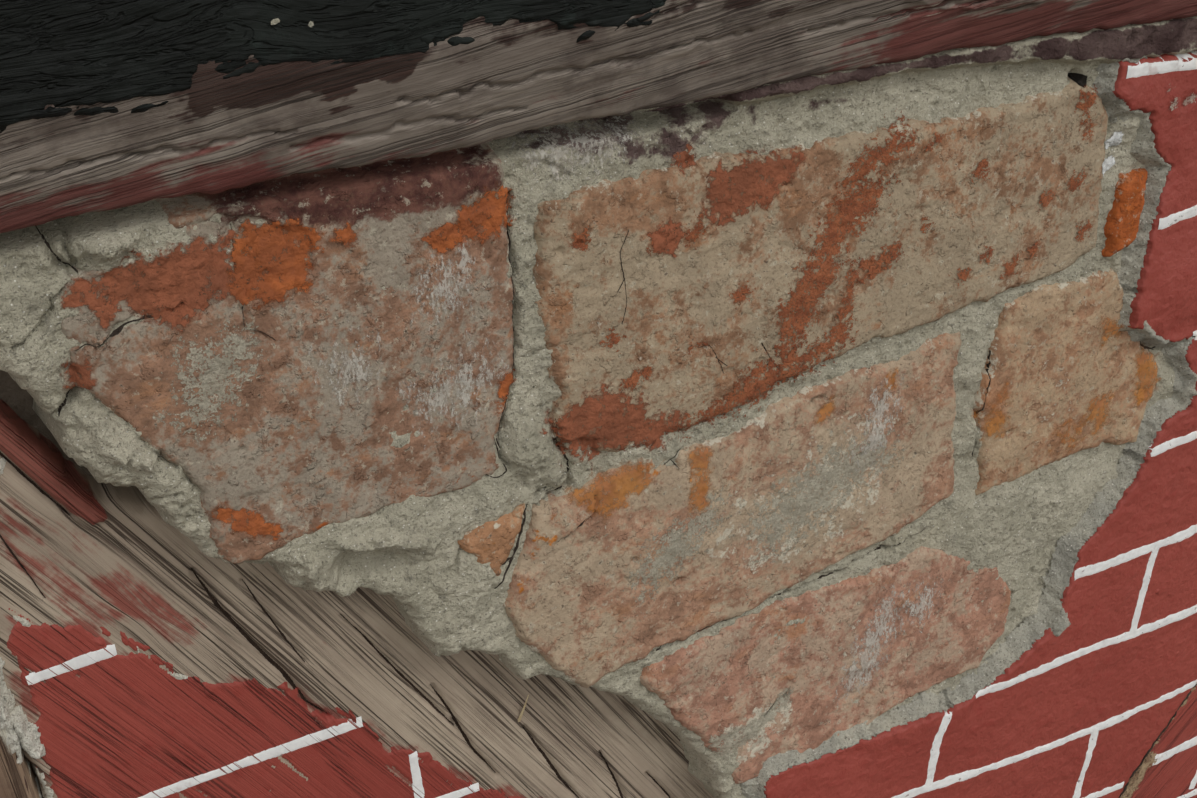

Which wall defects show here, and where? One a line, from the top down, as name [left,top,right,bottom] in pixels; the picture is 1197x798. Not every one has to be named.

peeling [31,101,169,120]
crack [35,226,78,273]
spalling [61,217,358,332]
spalling [421,185,515,254]
spalling [646,144,806,258]
spalling [61,358,97,390]
spalling [540,366,689,516]
flaking render [740,56,1197,798]
spalling [689,447,713,511]
spalling [212,502,284,541]
peeling [91,627,188,680]
crack [1119,684,1197,798]